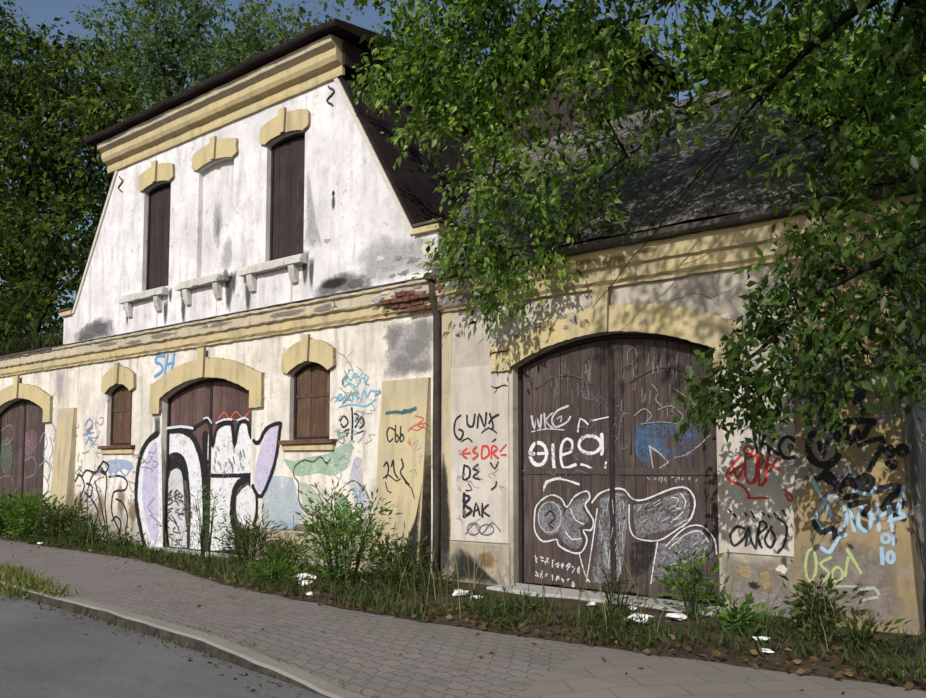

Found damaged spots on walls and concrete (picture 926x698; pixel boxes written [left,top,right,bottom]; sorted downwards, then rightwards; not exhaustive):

flaking render [364,235,436,279]
damp [163,289,185,322]
damp [271,253,370,318]
crack [671,284,744,308]
damp [78,320,140,347]
flaking render [372,275,488,377]
flaking render [513,315,586,339]